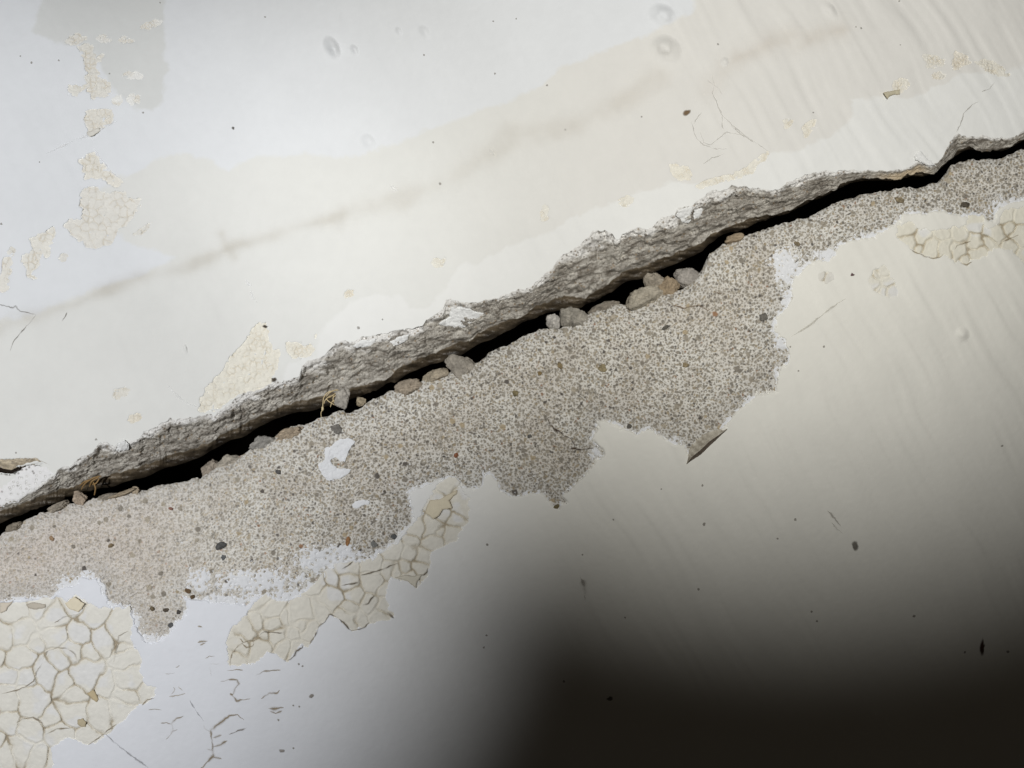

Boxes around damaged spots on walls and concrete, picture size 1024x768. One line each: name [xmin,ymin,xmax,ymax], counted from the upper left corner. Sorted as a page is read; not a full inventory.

peeling [65,33,114,137]
crack [0,82,1024,536]
spalling [0,149,1024,642]